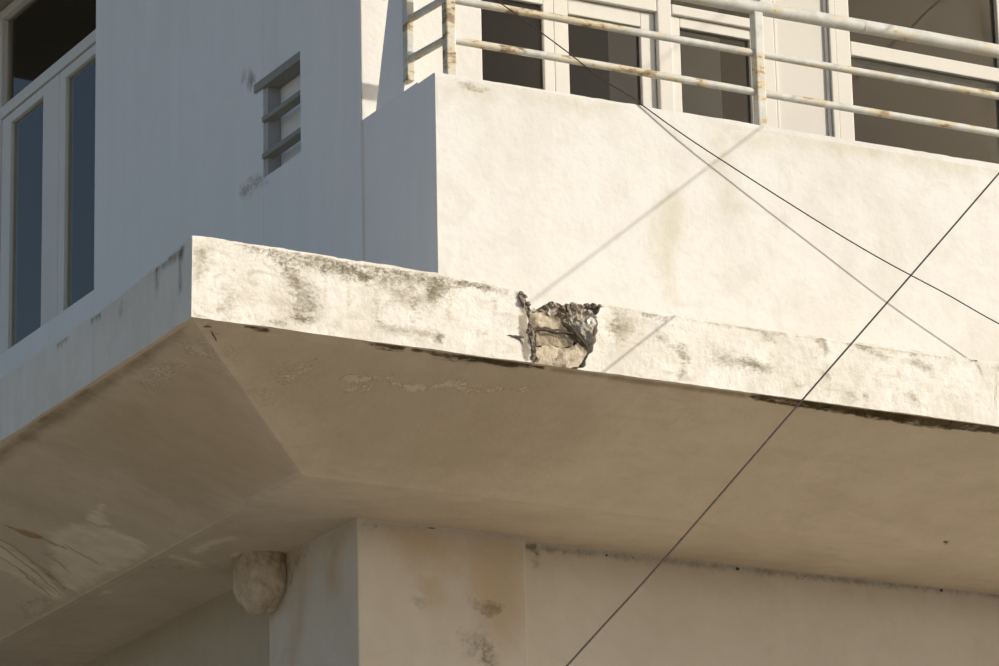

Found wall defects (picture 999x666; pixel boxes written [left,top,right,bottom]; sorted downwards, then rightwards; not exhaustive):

spalling [517,291,604,369]
damp [7,319,657,524]
peeling [0,503,156,601]